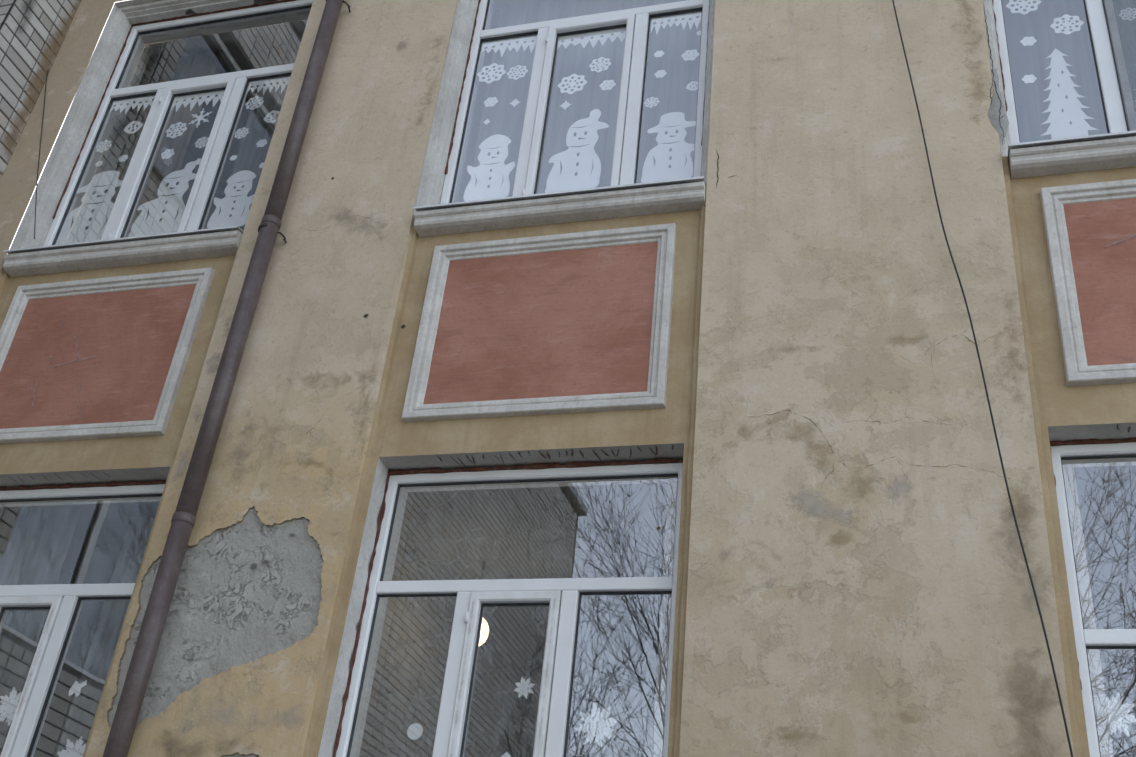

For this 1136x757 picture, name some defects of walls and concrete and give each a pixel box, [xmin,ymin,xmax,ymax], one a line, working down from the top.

spalling [107,556,162,728]
spalling [136,506,324,726]